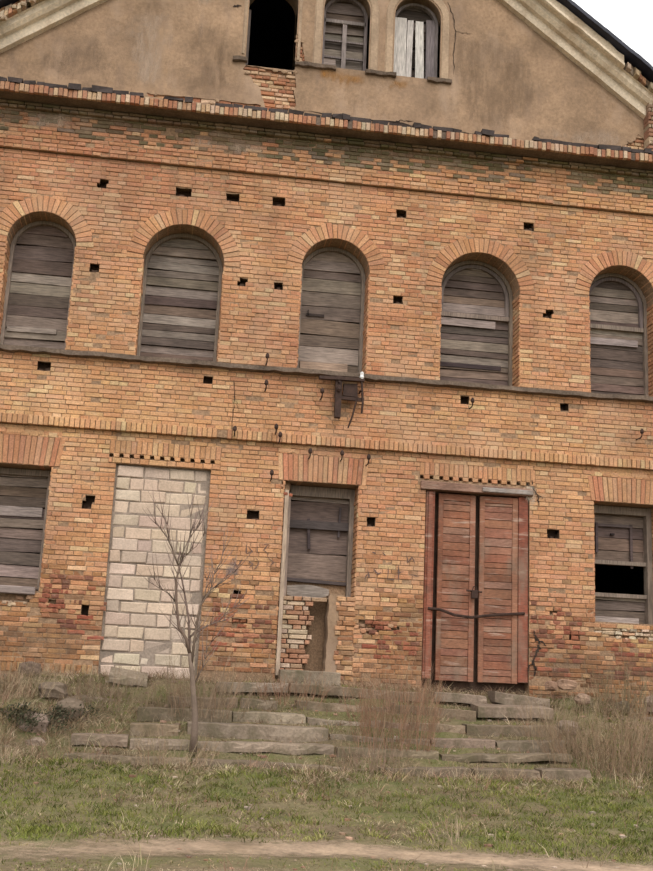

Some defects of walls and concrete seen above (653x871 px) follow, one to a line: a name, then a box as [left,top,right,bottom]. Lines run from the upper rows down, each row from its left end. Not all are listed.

spalling [147,35,305,112]
crack [449,5,468,73]